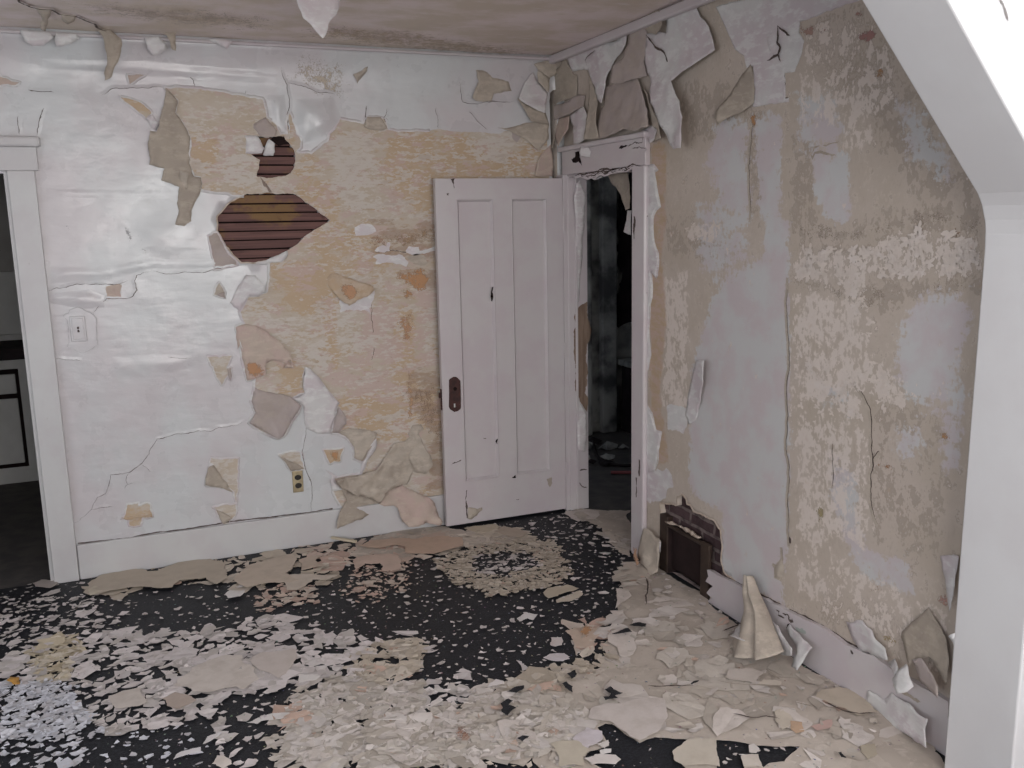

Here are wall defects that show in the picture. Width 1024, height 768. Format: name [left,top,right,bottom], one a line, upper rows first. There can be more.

crack [767,25,790,102]
peeling [106,284,122,297]
peeling [163,84,549,507]
crack [74,418,247,523]
crack [854,385,881,526]
spalling [659,493,735,581]